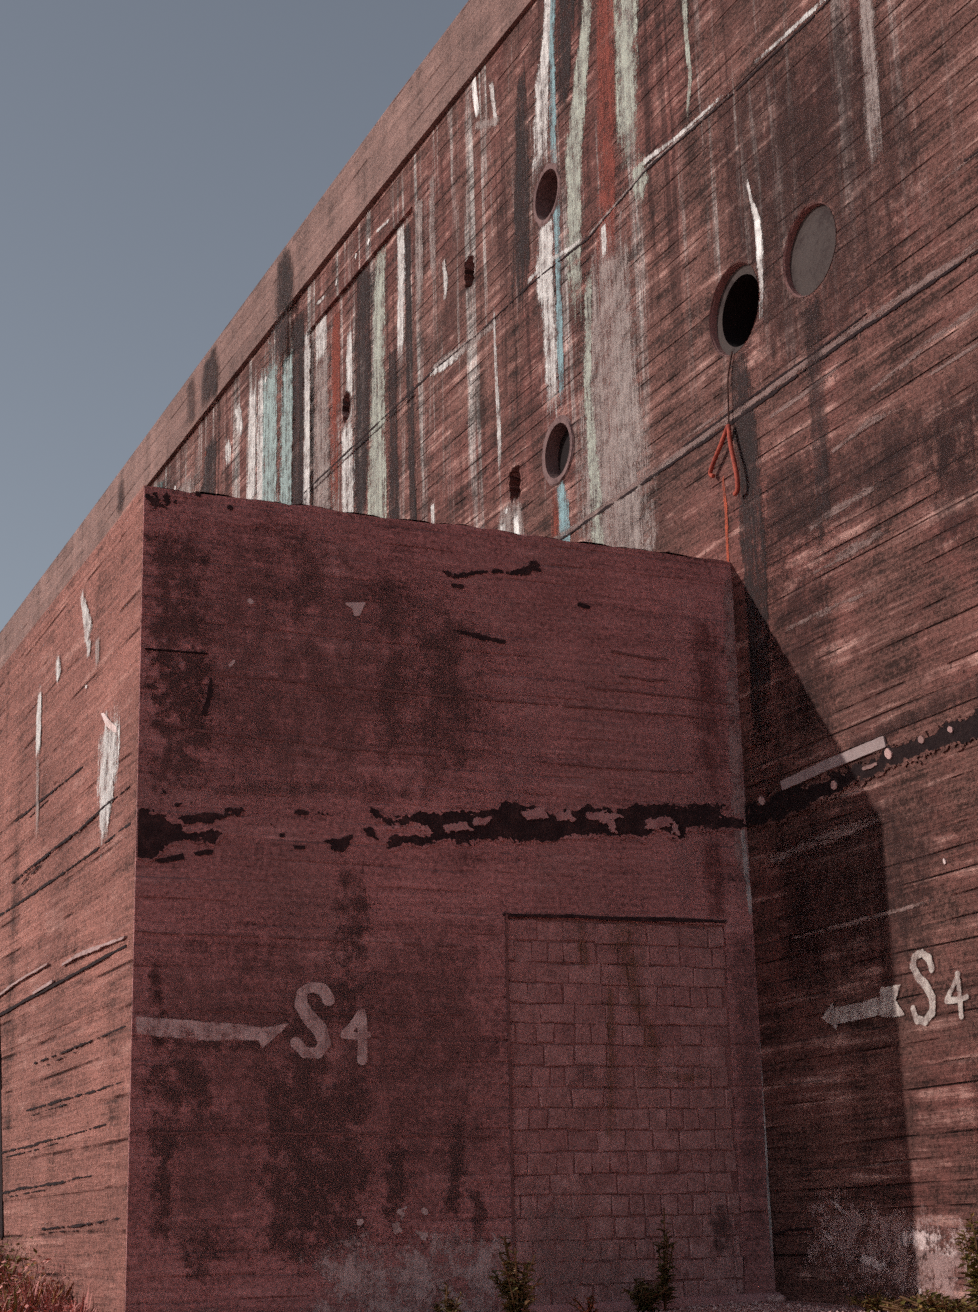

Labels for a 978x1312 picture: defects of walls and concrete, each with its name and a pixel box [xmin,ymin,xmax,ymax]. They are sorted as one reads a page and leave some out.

damp [632,0,718,199]
damp [763,0,825,55]
damp [860,0,881,157]
damp [140,536,213,799]
spalling [136,789,245,864]
damp [345,602,366,616]
spalling [443,560,542,589]
spalling [322,578,978,914]
damp [144,1035,257,1281]
damp [258,871,511,1312]
peeling [761,1069,773,1251]